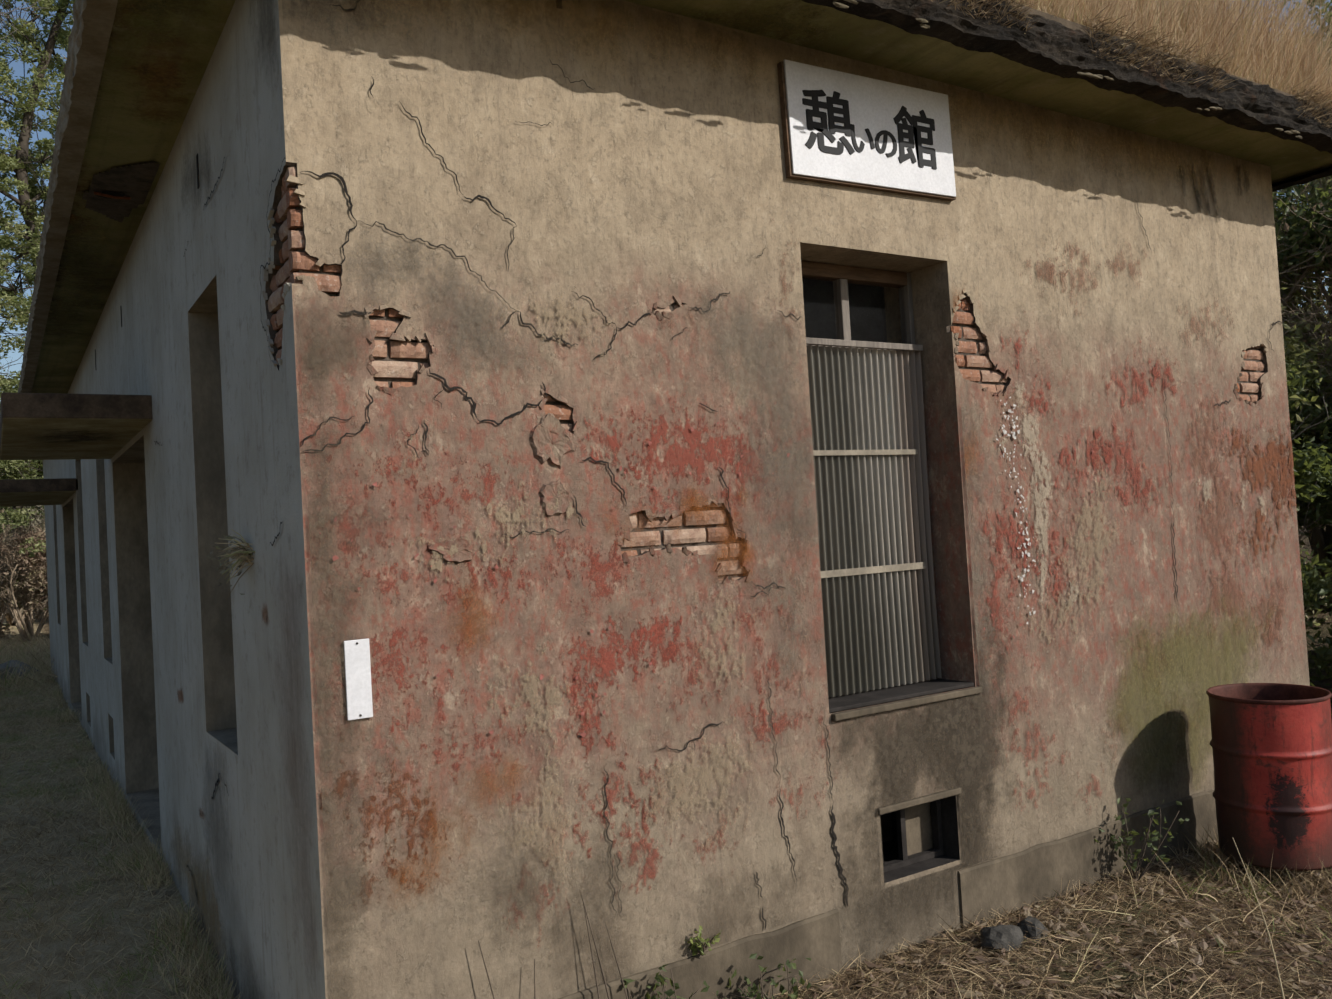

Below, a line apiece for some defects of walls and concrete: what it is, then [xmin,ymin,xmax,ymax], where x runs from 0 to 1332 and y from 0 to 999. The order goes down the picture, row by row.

spalling [262,167,341,367]
crack [300,388,373,454]
spalling [364,304,435,395]
crack [260,76,650,360]
crack [407,368,547,459]
peeling [950,290,1181,667]
peeling [1222,342,1297,567]
peeling [311,388,834,941]
crack [659,721,725,751]
crack [767,671,797,882]
crack [823,715,849,906]
water stain [1121,614,1254,777]